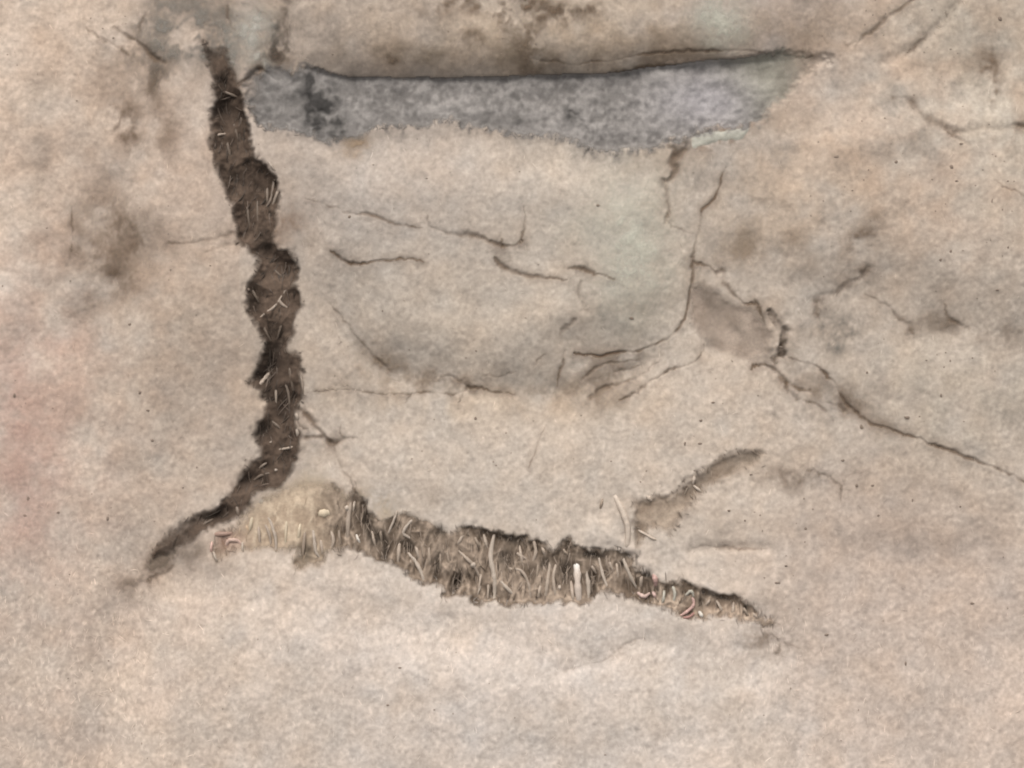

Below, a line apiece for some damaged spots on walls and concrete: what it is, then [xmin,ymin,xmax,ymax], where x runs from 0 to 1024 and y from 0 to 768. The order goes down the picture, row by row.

crack [240,67,266,84]
peeling [245,50,792,158]
crack [670,152,678,178]
crack [700,174,723,212]
crack [330,250,423,265]
crack [470,232,613,279]
crack [727,285,761,315]
crack [557,262,704,400]
crack [303,390,338,444]
crack [418,386,511,402]
crack [751,341,981,463]
peeling [600,448,767,548]